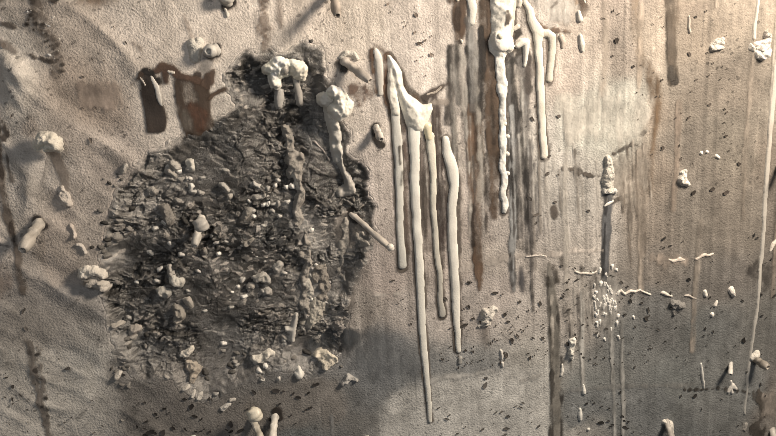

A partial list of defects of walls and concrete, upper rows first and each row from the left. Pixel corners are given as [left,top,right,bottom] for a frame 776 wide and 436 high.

spalling [90,0,380,436]
leakage [420,0,488,244]
leakage [495,52,581,311]
leakage [595,141,652,292]
leakage [666,0,679,85]